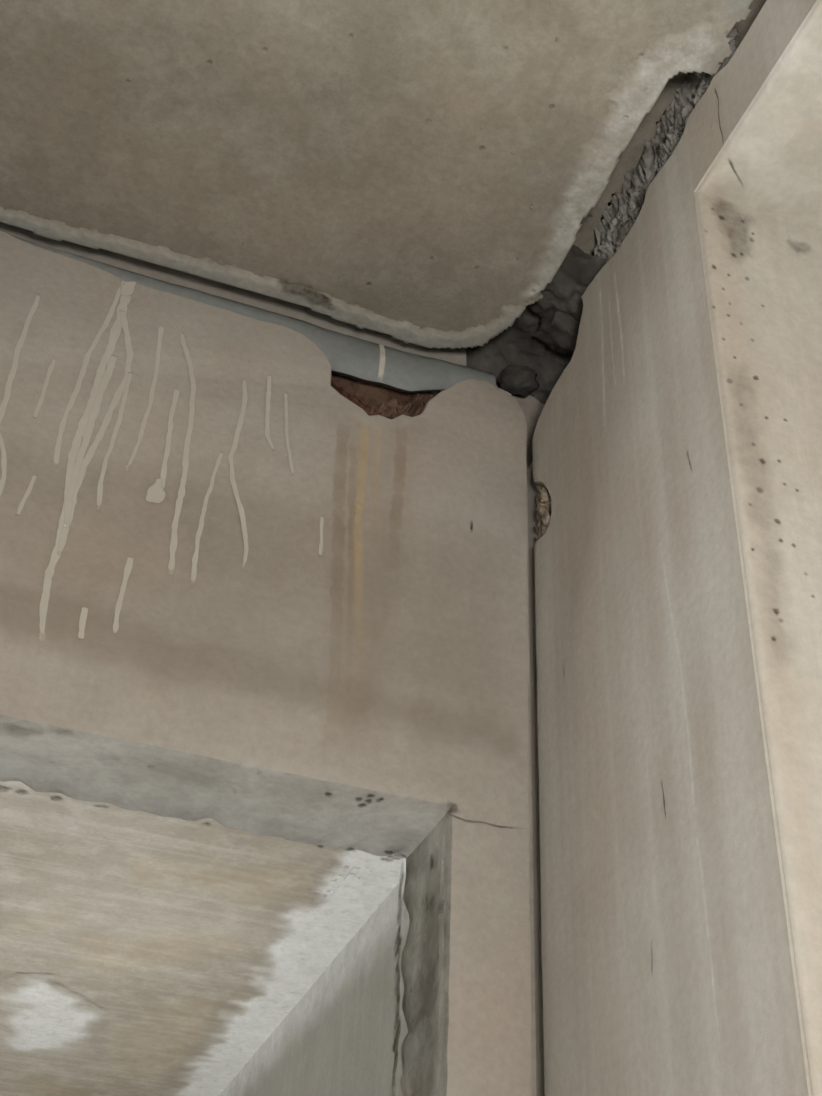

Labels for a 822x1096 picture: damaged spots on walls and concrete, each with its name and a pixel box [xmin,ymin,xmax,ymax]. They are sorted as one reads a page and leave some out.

spalling [466,25,740,404]
damp [0,295,40,496]
damp [39,281,137,634]
damp [146,334,196,571]
damp [191,380,249,581]
spalling [331,373,437,419]
damp [78,607,88,639]
damp [0,973,109,1057]